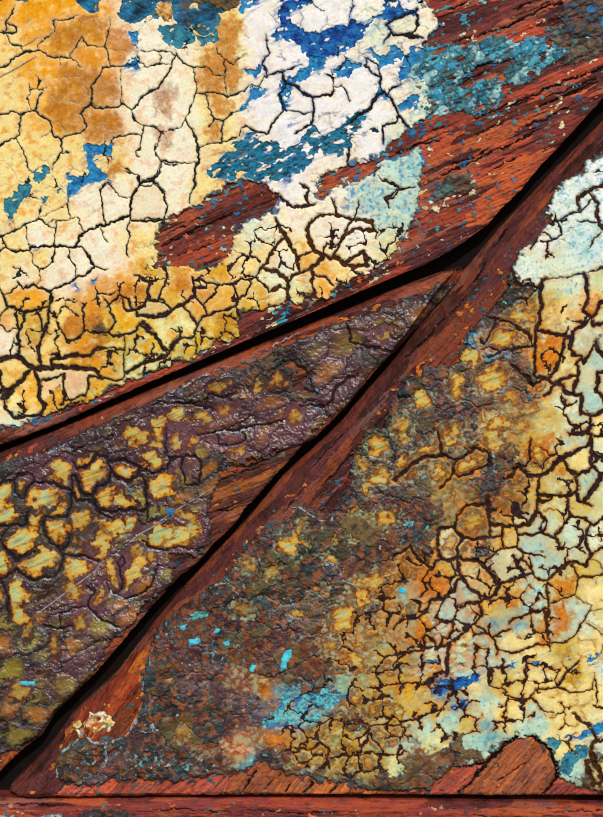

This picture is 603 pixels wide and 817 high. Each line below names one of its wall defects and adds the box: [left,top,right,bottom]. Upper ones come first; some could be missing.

crack [454,0,563,42]
peeling [239,64,266,111]
crack [460,60,507,85]
crack [441,66,603,176]
crack [0,0,448,420]
peeling [143,108,423,275]
crack [0,419,285,630]
crack [160,169,603,815]
peeling [1,745,22,766]
peeling [413,722,603,794]
crack [0,801,68,809]